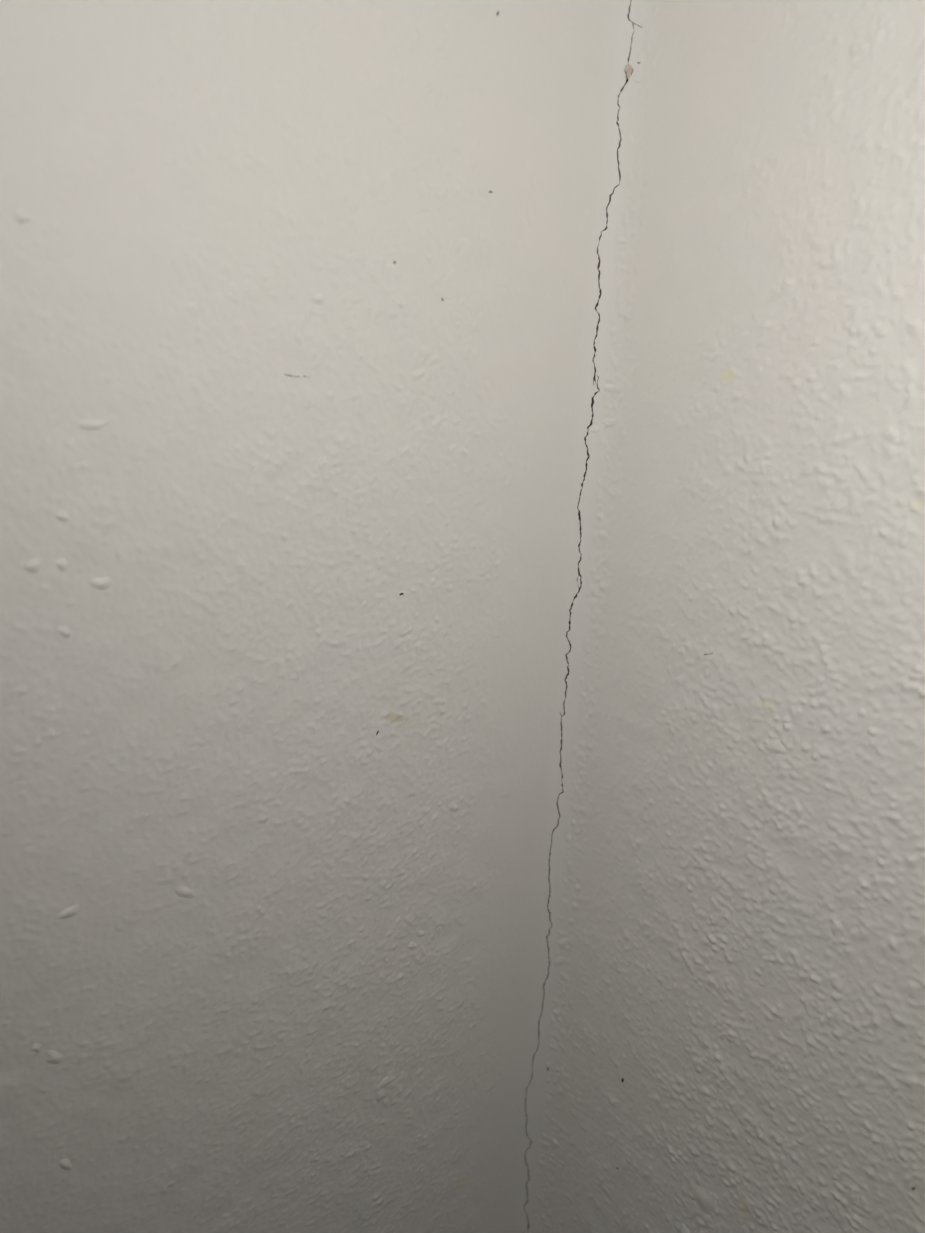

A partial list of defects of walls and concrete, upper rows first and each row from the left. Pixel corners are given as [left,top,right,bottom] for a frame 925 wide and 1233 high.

crack [523,3,642,1233]